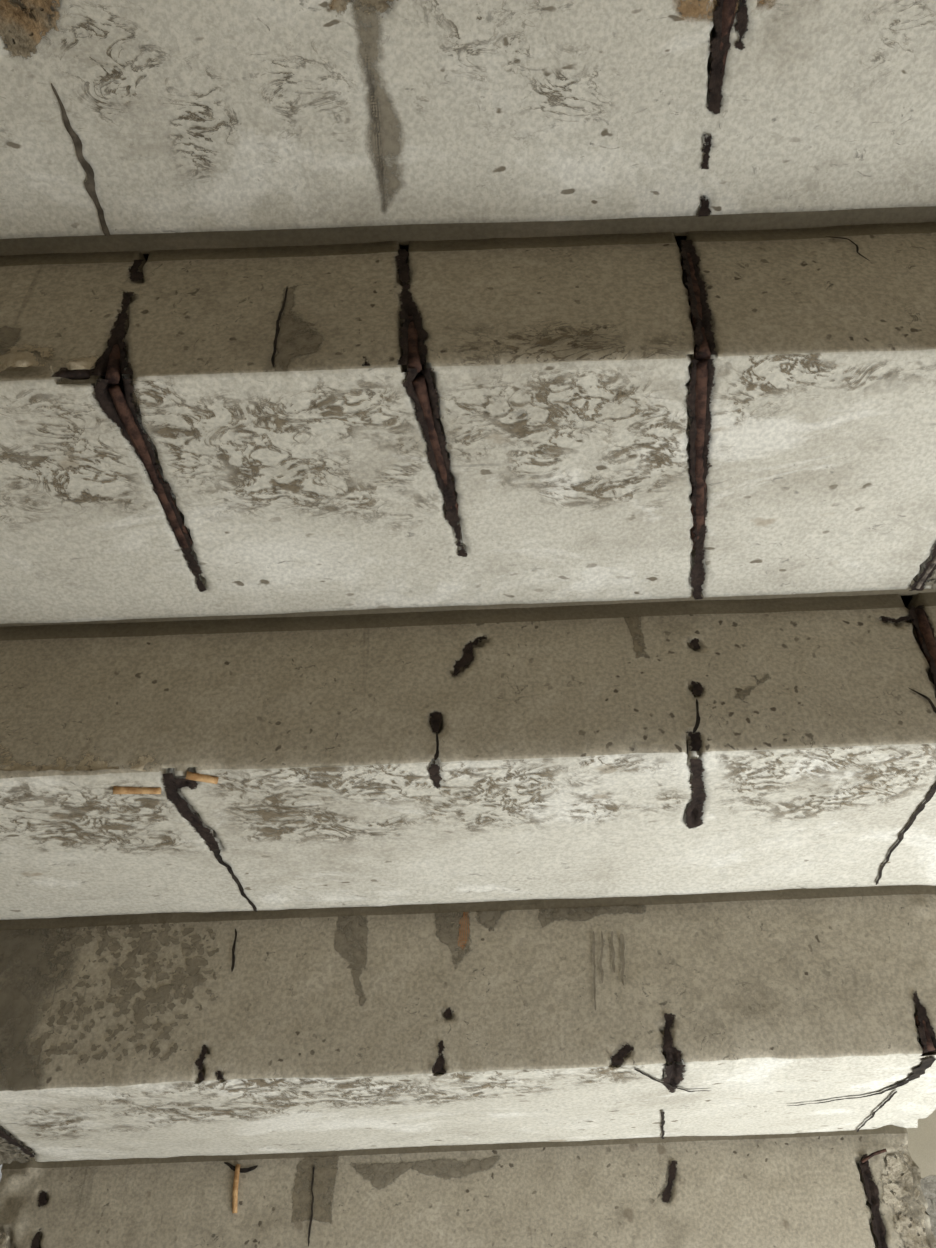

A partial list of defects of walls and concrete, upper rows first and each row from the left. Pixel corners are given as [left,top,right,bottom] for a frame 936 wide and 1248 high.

spalling [0,0,160,114]
peeling [174,75,238,174]
peeling [271,56,312,116]
spalling [329,0,398,17]
peeling [452,22,481,56]
peeling [534,73,580,114]
peeling [719,354,891,421]
peeling [0,396,132,512]